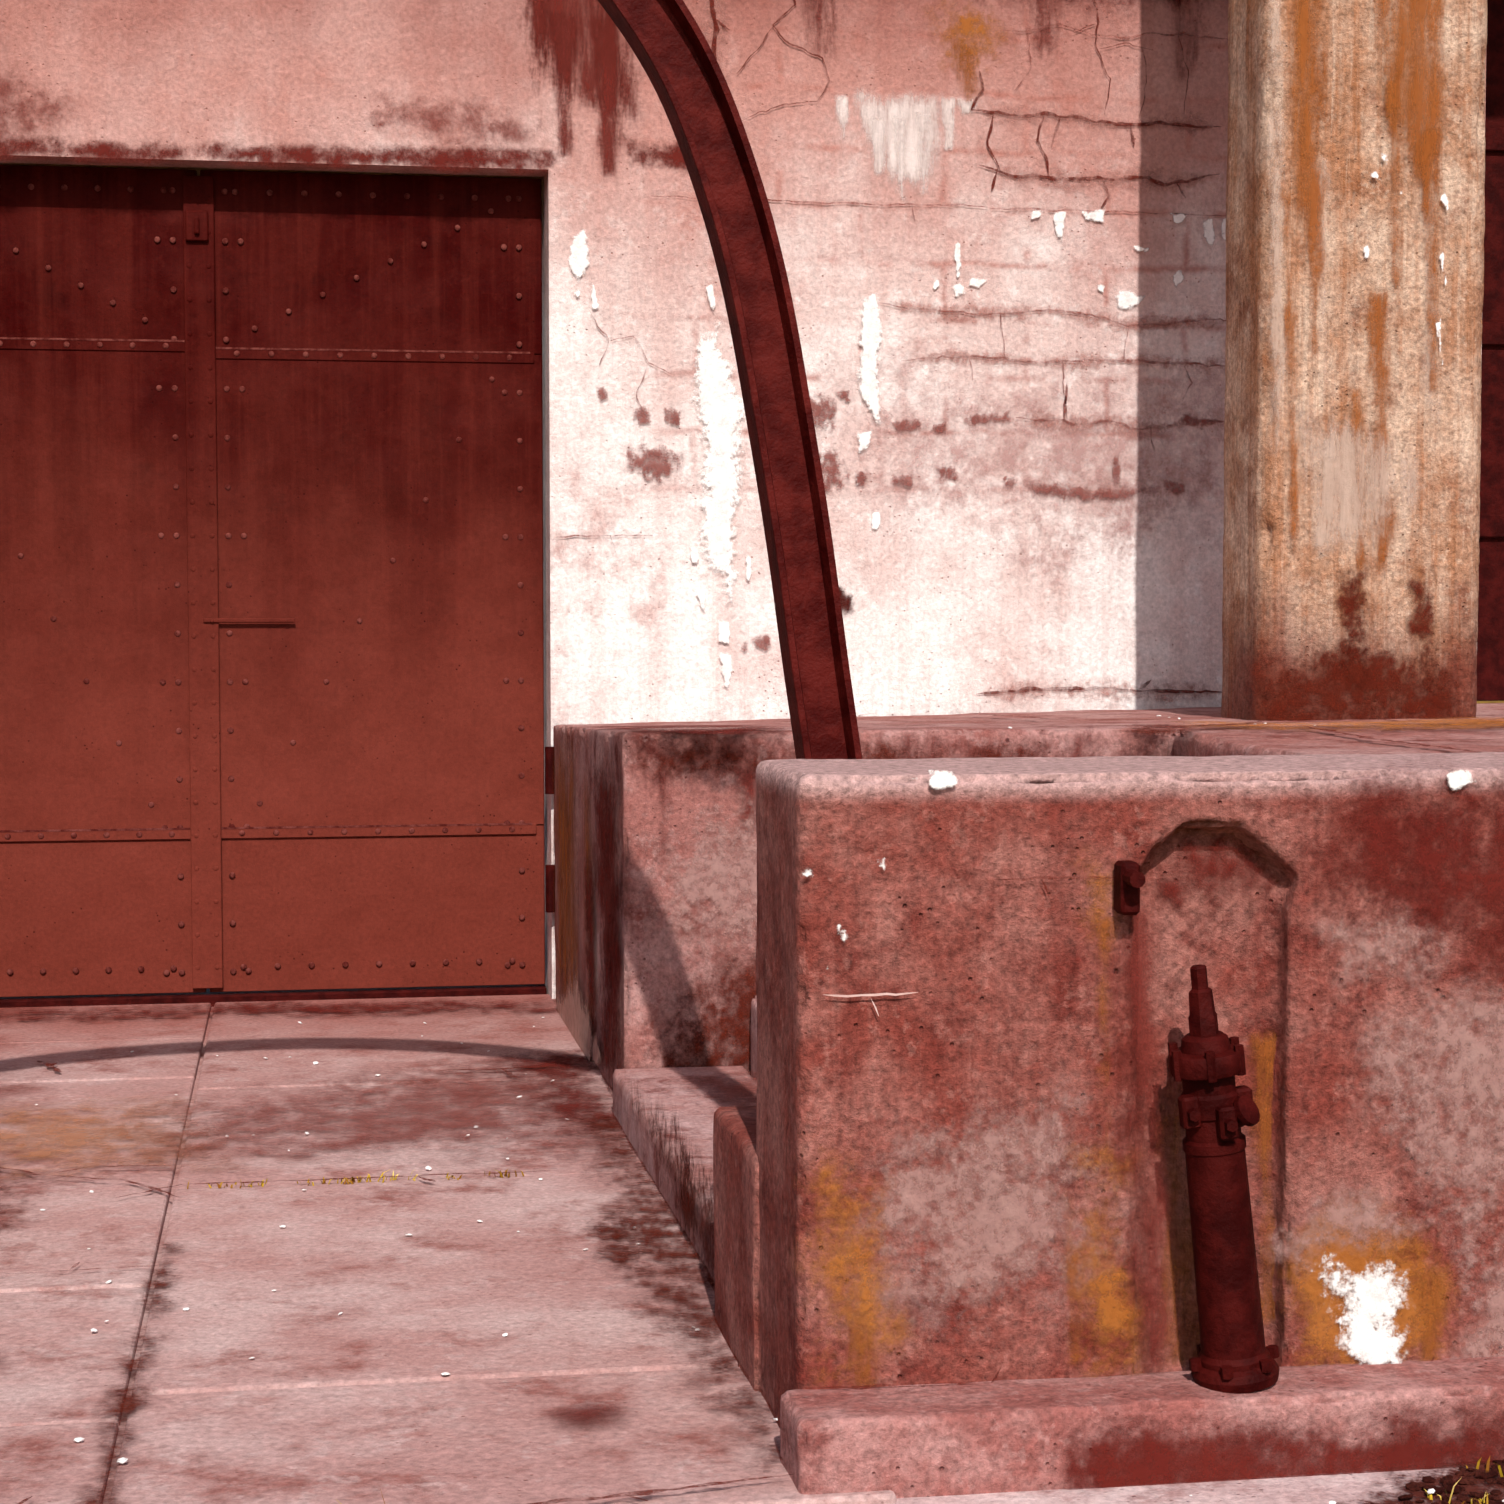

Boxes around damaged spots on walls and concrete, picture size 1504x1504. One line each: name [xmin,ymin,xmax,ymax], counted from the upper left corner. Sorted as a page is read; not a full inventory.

water stain [203,0,686,174]
peeling [569,229,599,309]
crack [707,0,830,121]
crack [768,0,1226,221]
rust [1285,0,1326,305]
rust [1375,0,1445,389]
peeling [627,284,752,609]
peeling [810,294,946,452]
spalling [1004,456,1146,500]
rust [1351,207,1403,589]
water stain [1338,573,1367,688]
water stain [1409,580,1434,660]